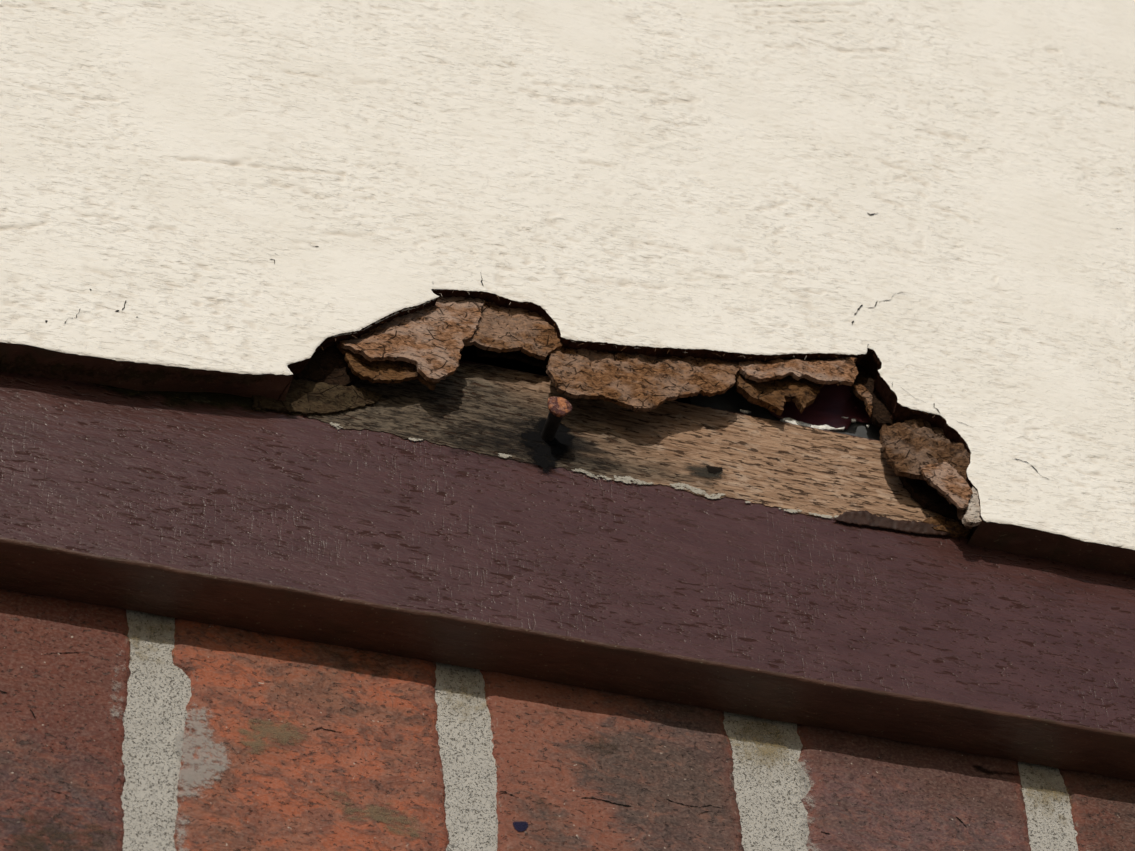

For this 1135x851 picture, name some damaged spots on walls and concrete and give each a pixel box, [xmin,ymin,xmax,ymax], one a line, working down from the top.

spalling [251,289,986,538]